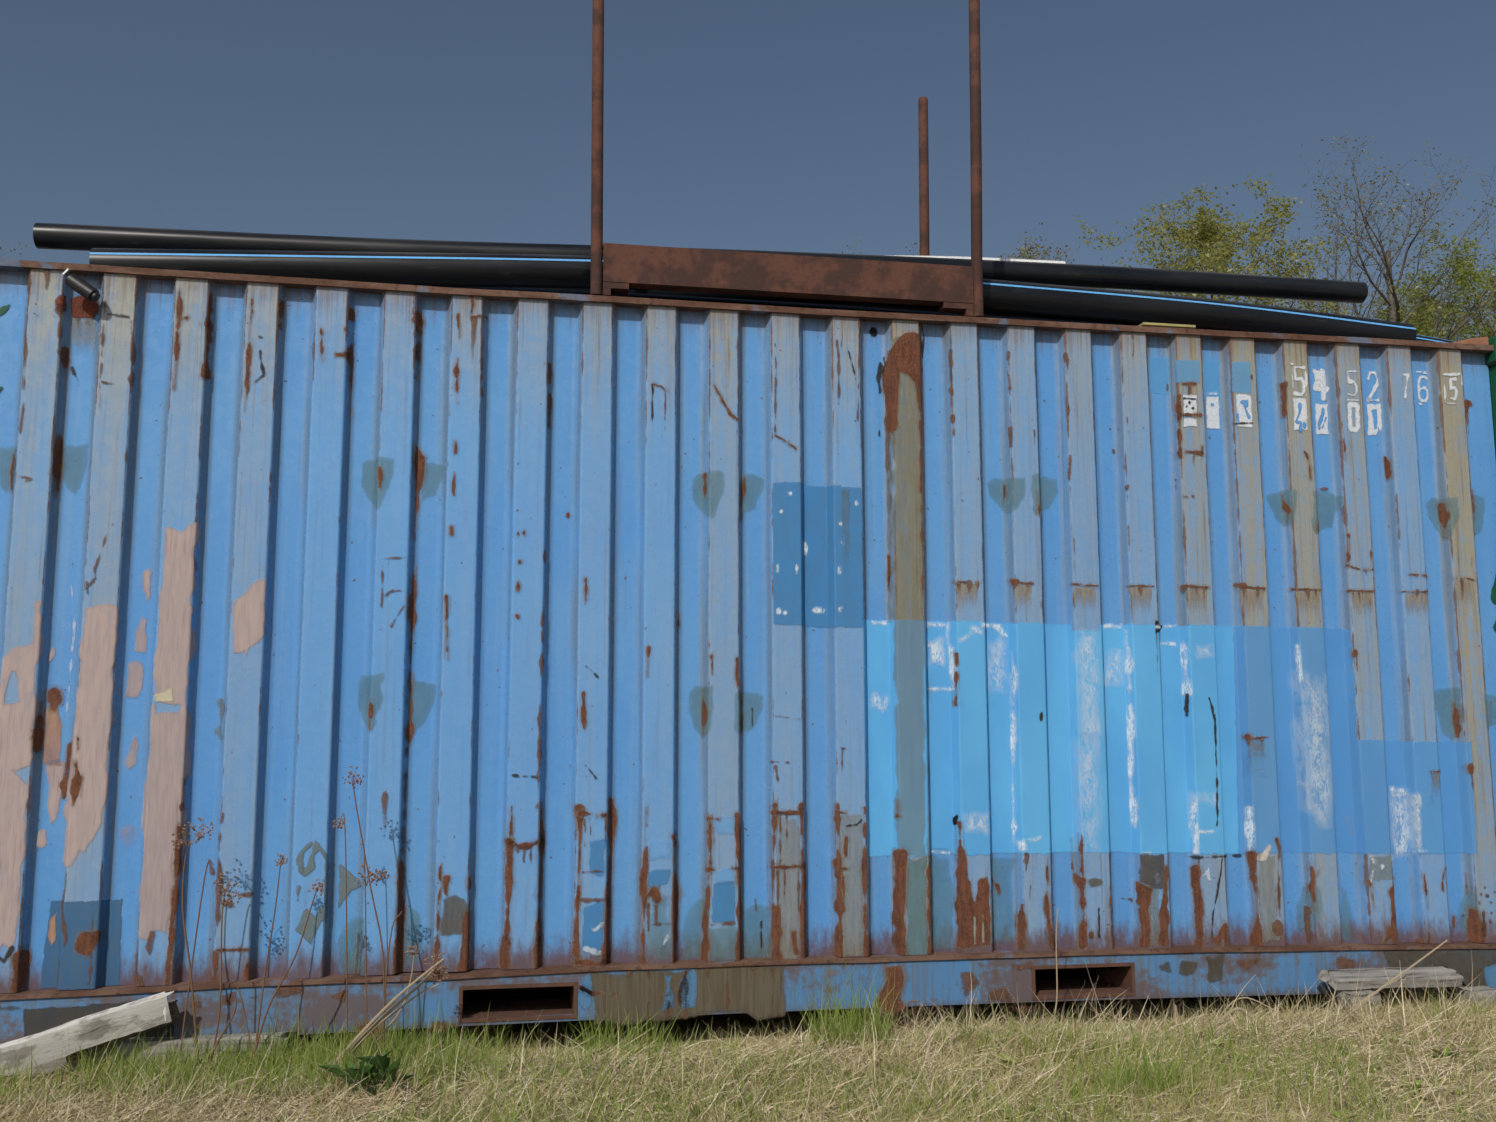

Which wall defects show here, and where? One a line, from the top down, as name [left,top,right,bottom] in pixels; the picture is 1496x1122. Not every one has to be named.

corrosion [882,331,924,549]
peeling [233,579,266,655]
corrosion [30,687,62,752]
peeling [0,522,200,948]
corrosion [381,574,417,974]
corrosion [433,864,472,972]
corrosion [499,801,546,970]
corrosion [573,797,618,966]
corrosion [647,832,681,963]
corrosion [891,848,908,955]
corrosion [953,815,1000,949]
corrosion [1189,858,1229,947]